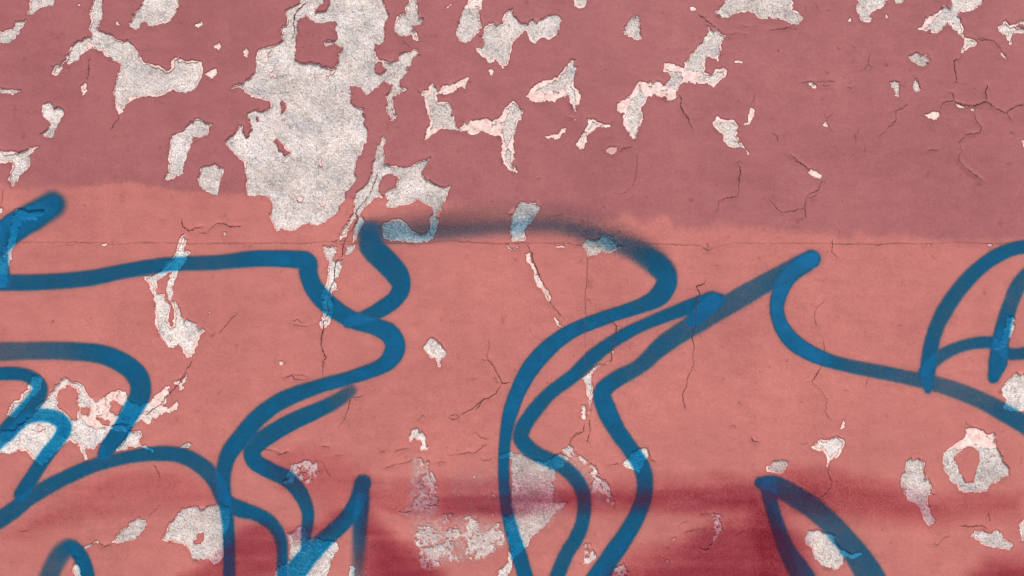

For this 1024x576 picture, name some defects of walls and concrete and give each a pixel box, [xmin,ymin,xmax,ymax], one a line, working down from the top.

peeling [50,0,218,115]
peeling [0,101,65,188]
peeling [163,117,225,196]
peeling [224,0,804,330]
crack [770,133,820,218]
crack [927,59,1022,178]
peeling [142,232,211,359]
crack [3,172,1001,408]
peeling [0,372,188,466]
crack [439,353,511,463]
spalling [399,428,615,576]
peeling [941,427,1011,494]